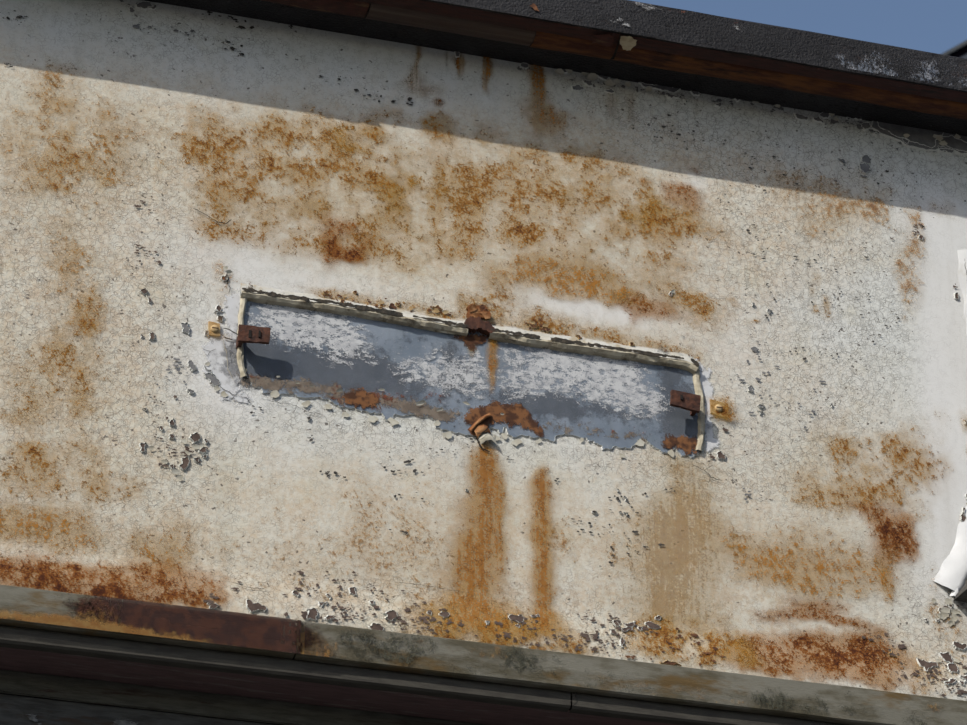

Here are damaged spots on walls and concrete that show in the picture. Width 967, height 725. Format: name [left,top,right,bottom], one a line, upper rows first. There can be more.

corrosion [158,65,734,385]
corrosion [0,231,336,657]
corrosion [318,442,598,657]
peeling [213,284,726,460]
corrosion [464,400,544,437]
peeling [571,488,665,555]
corrosion [625,423,967,709]